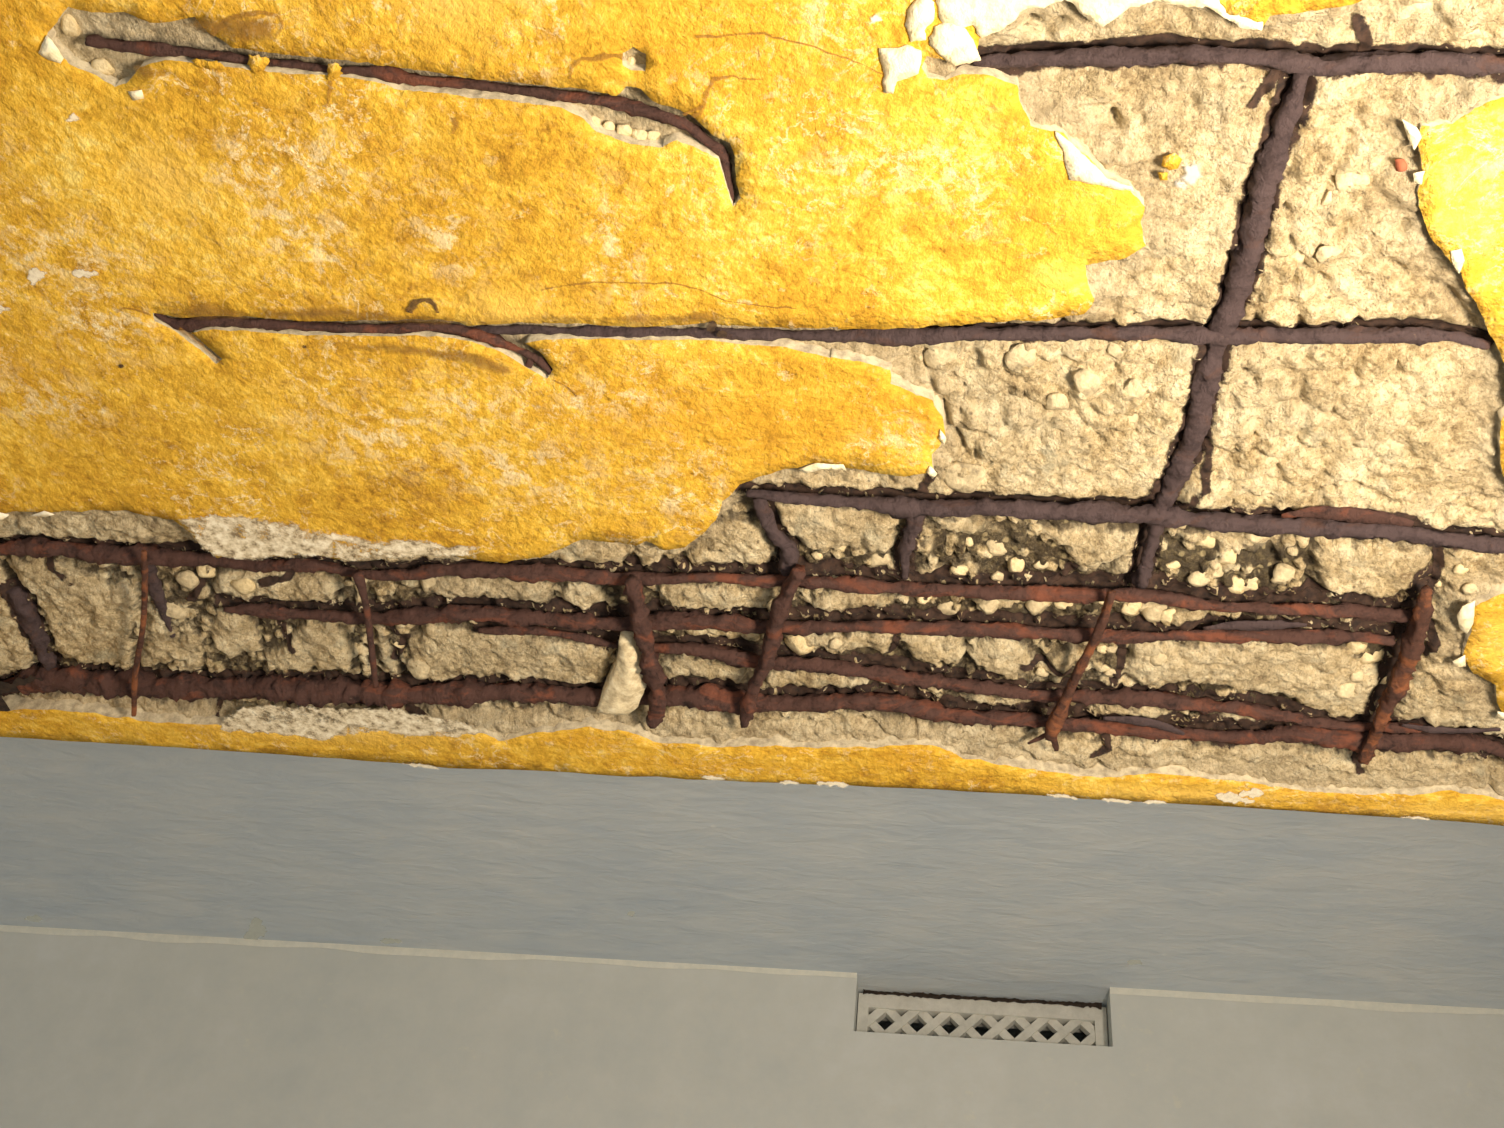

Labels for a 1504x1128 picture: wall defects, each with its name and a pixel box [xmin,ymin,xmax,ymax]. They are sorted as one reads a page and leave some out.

crack [0,675,43,711]
corrosion [0,14,1504,760]
spalling [0,0,1504,804]
corrosion [1349,749,1365,775]